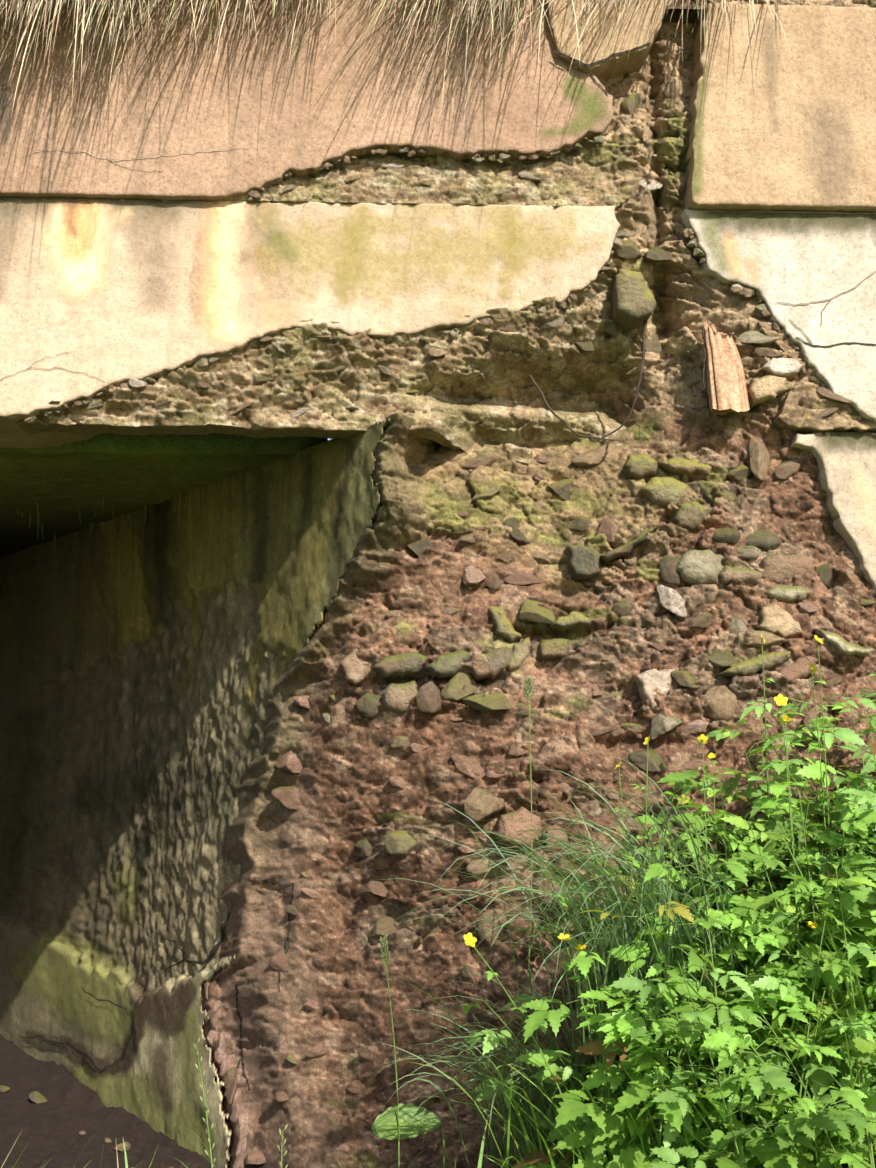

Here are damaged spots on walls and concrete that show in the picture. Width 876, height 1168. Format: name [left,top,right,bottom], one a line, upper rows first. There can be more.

spalling [225,133,635,210]
corrosion [45,203,106,297]
corrosion [202,200,246,342]
spalling [16,230,644,464]
spalling [681,227,706,263]
spalling [729,282,876,433]
crack [776,271,876,347]
leakage [15,932,133,1044]
crack [19,987,136,1072]
peeling [25,975,250,1168]
crack [158,911,230,974]
crack [254,876,294,992]